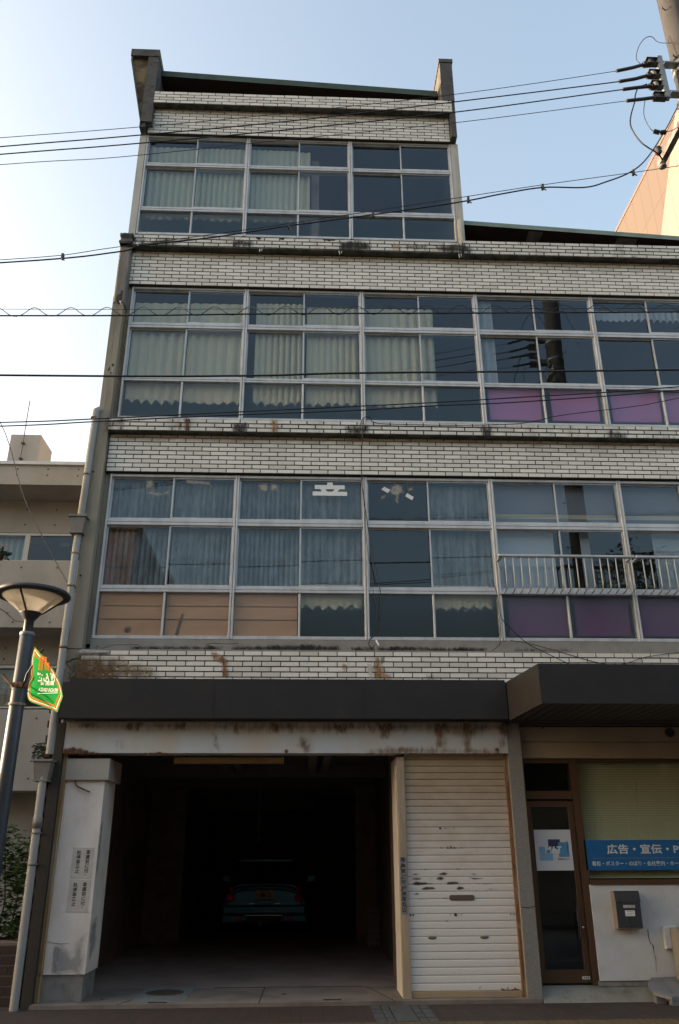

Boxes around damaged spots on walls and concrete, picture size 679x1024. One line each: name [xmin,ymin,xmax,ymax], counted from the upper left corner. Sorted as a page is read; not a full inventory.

leakage [341,241,369,251]
leakage [438,243,470,258]